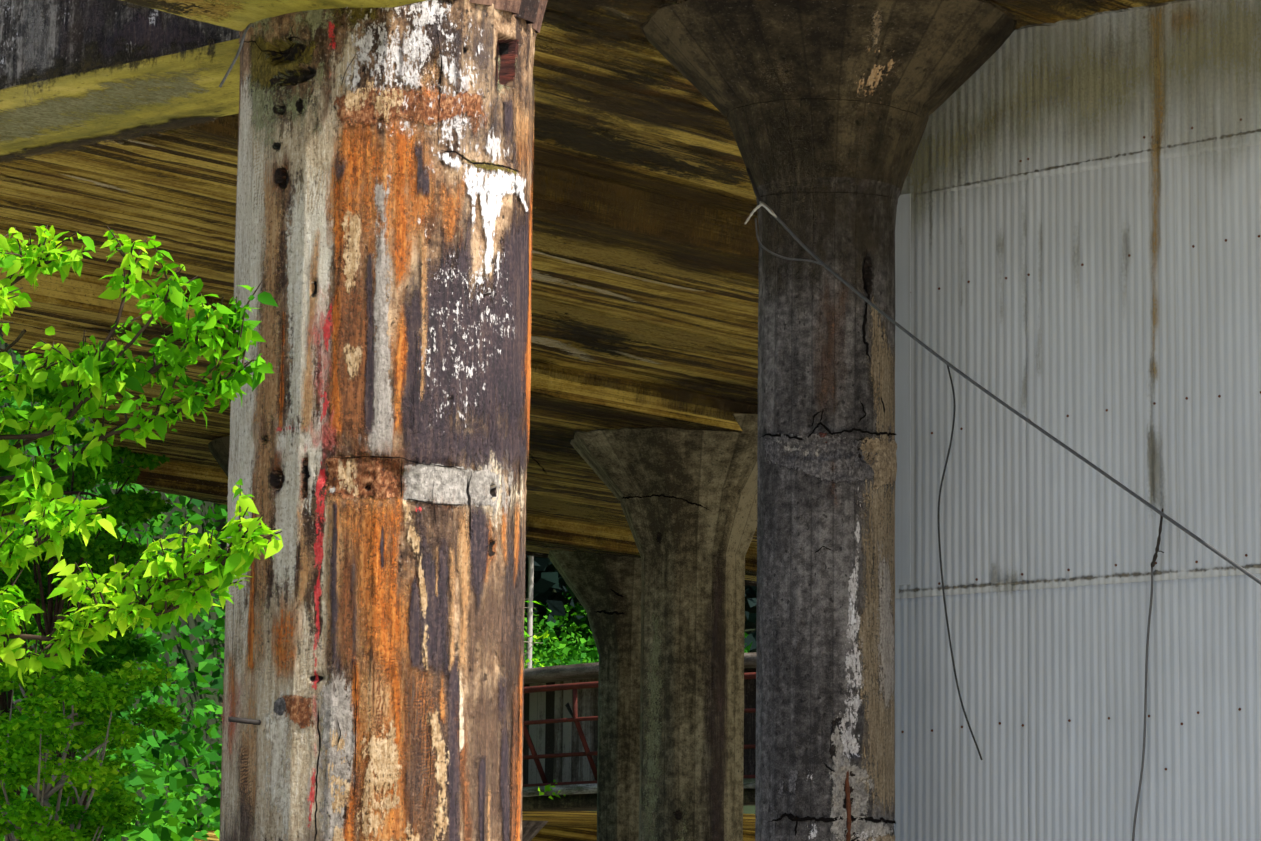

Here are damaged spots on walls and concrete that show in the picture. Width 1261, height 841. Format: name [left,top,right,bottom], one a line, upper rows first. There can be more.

damp [184,292,232,311]
rust [302,119,464,451]
rust [228,164,314,818]
spalling [223,7,524,841]
damp [298,0,908,841]
crack [761,397,897,440]
spalling [763,432,897,489]
damp [899,564,1261,593]
crack [314,663,357,841]
rust [326,495,472,841]
rust [510,669,523,841]
crack [768,813,896,836]